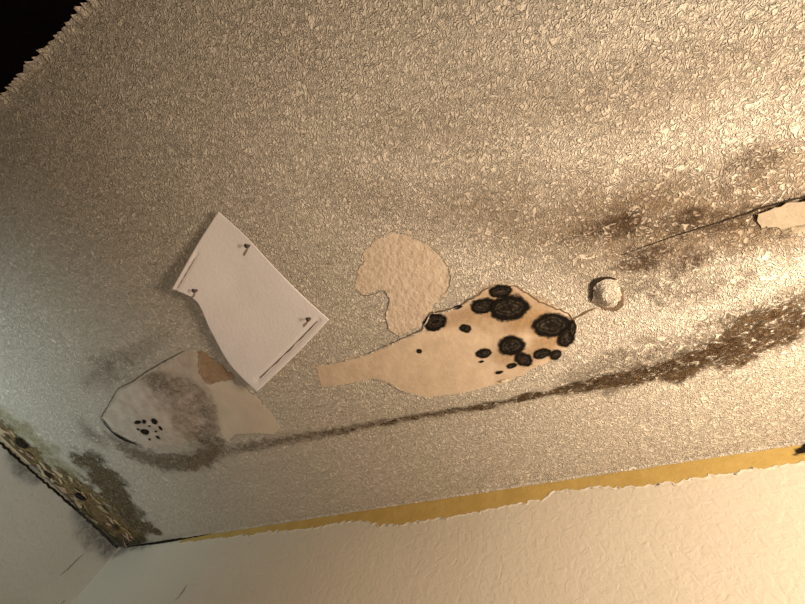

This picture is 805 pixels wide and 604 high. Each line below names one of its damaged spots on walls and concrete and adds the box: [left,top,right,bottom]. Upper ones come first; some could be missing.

damp [538,152,805,271]
crack [622,196,805,255]
peeling [312,229,596,399]
damp [13,424,162,544]
damp [111,408,223,471]
peeling [100,350,282,450]
damp [198,351,234,384]
peeling [178,440,805,544]
damp [242,285,805,450]